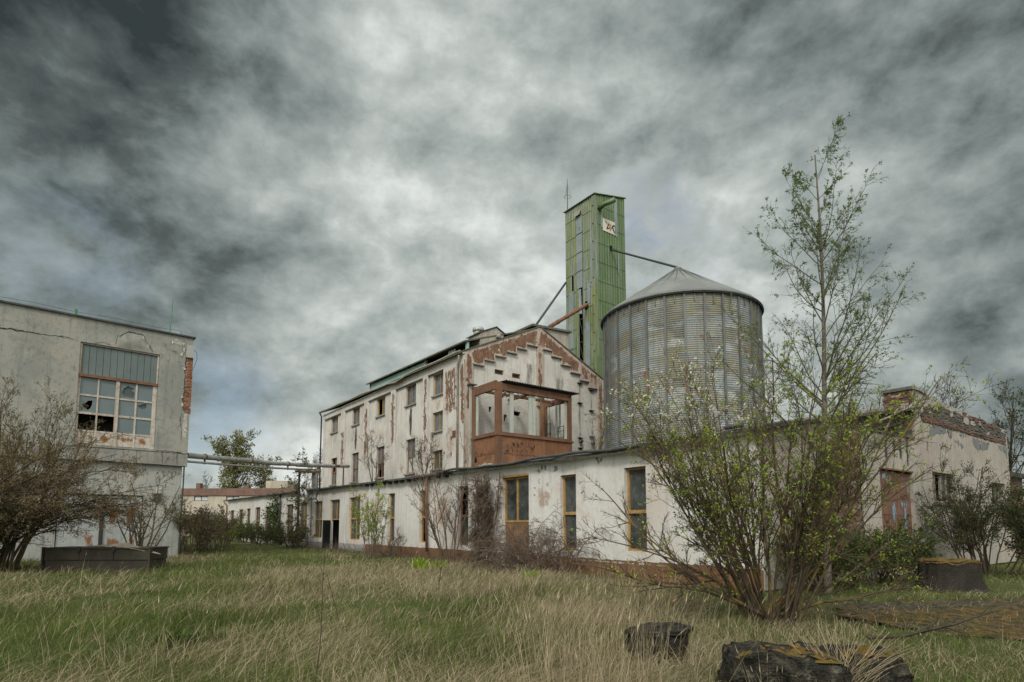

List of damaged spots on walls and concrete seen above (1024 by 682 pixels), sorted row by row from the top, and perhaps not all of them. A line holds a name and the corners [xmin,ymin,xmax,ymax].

crack [0,327,77,341]
flaking render [172,339,194,438]
peeling [445,331,604,463]
flaking render [919,401,1007,457]
peeling [533,465,557,506]